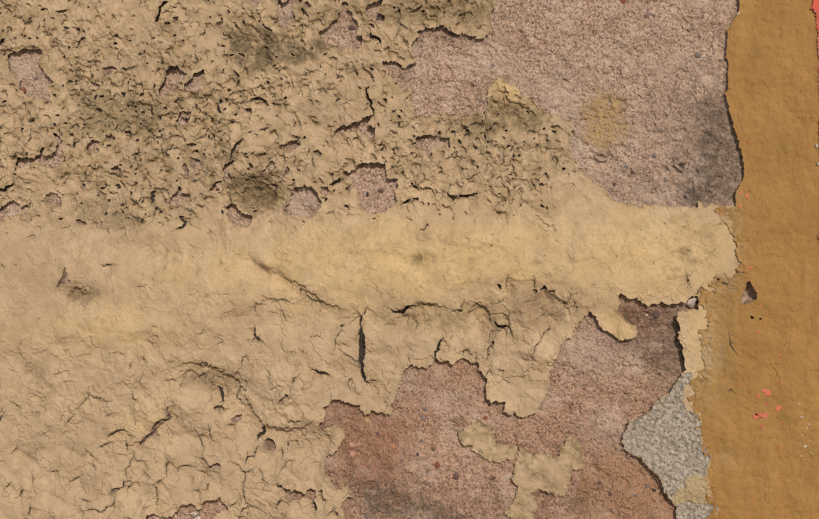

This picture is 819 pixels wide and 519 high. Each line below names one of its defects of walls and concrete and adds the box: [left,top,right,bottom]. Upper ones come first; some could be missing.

spalling [0,9,77,102]
spalling [15,114,84,171]
spalling [86,131,115,153]
spalling [139,37,205,126]
spalling [209,160,235,191]
spalling [221,203,258,227]
spalling [319,0,363,62]
spalling [284,112,404,223]
spalling [382,0,744,208]
crack [0,273,612,519]
spalling [318,293,718,519]
spalling [146,497,228,519]